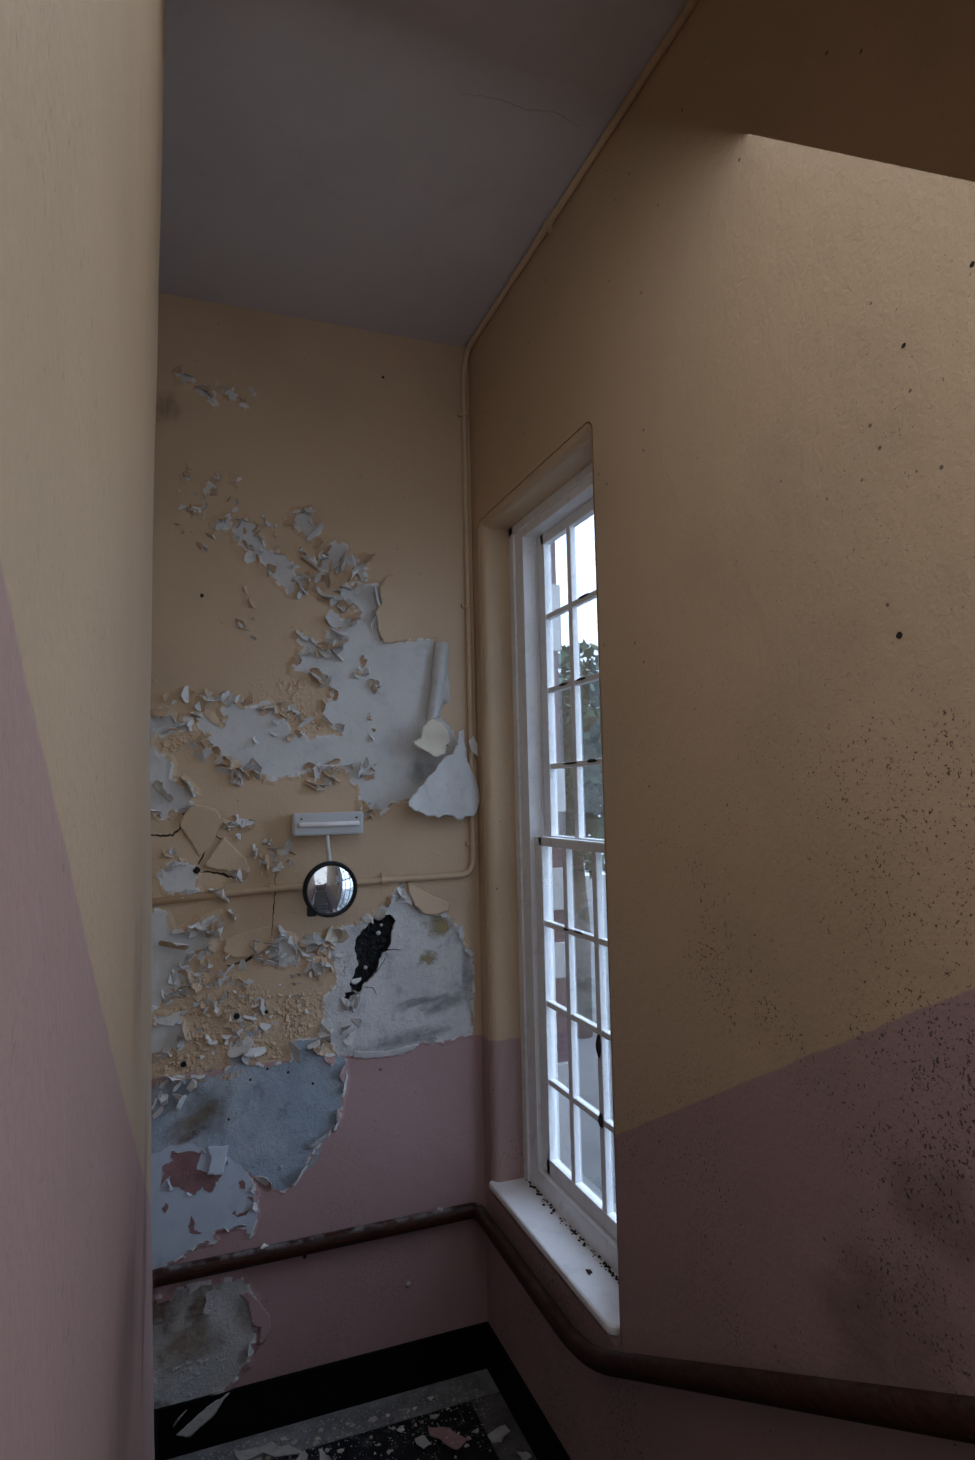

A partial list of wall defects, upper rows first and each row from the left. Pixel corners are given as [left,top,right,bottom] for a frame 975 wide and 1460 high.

peeling [150,463,480,823]
peeling [151,814,478,1270]
peeling [152,1271,272,1437]